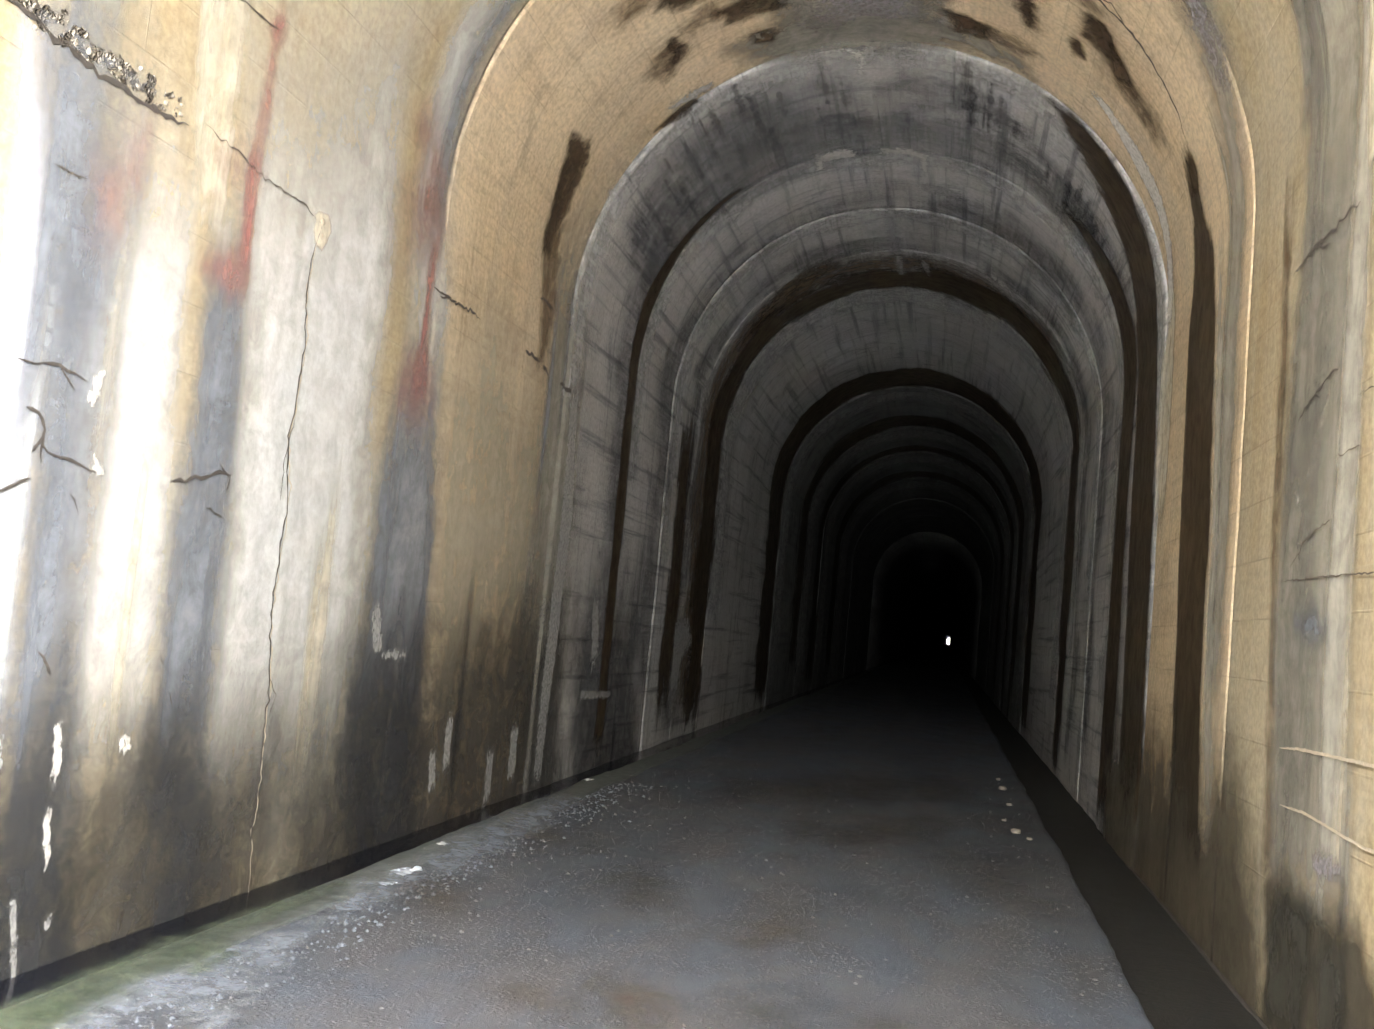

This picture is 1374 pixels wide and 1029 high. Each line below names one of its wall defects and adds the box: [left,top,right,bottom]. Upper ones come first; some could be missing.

spalling [9,0,188,125]
rust [219,152,261,290]
crack [1293,201,1361,276]
crack [18,358,88,390]
crack [0,406,104,516]
crack [206,124,322,893]
damp [0,0,1042,981]
damp [657,206,1101,767]
damp [799,0,1374,1029]
crack [1283,520,1374,582]
crack [37,651,51,674]